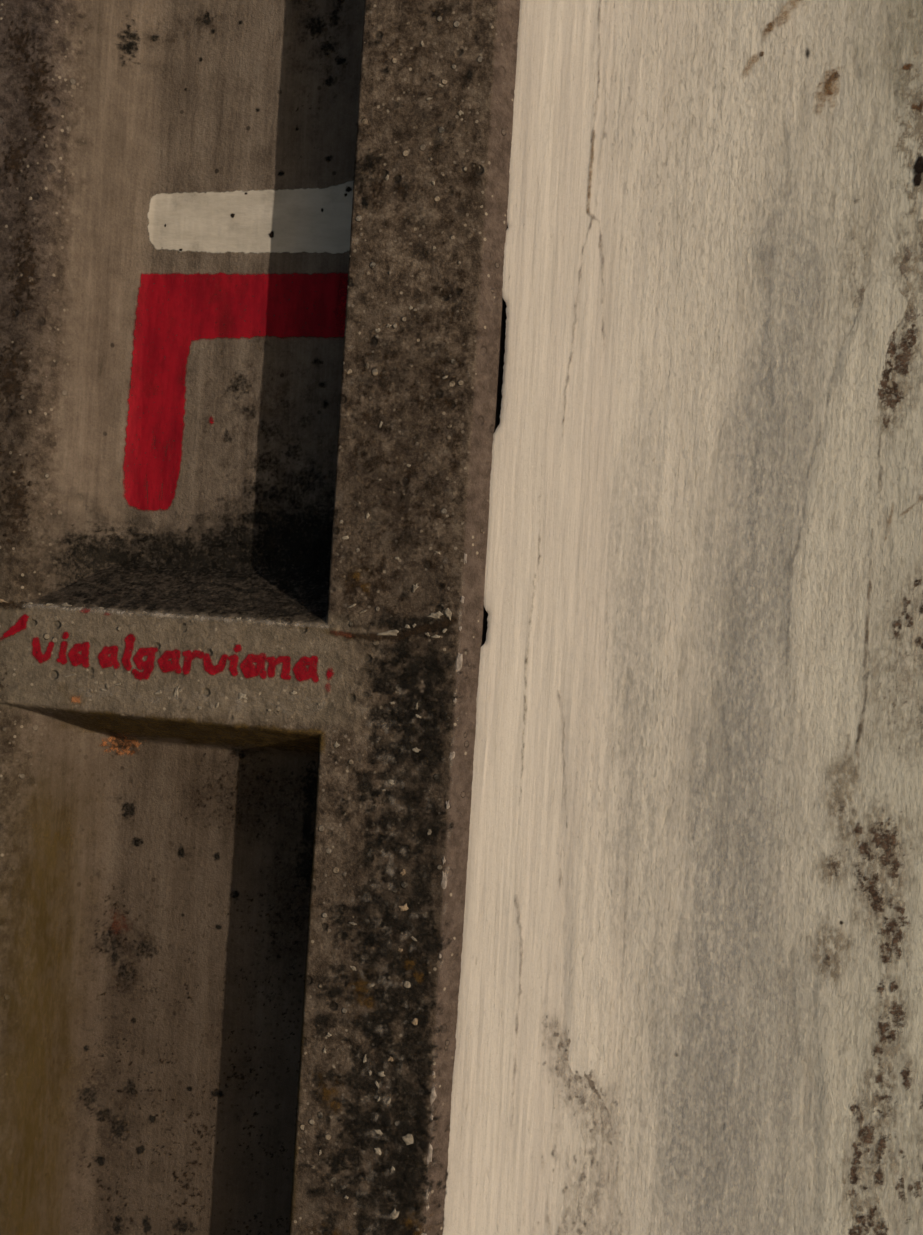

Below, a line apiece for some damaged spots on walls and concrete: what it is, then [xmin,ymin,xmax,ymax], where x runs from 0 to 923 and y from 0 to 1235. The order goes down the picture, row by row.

crack [580,135,603,272]
rust [817,71,840,106]
rust [896,47,923,213]
leakage [352,310,465,469]
leakage [46,446,462,1235]